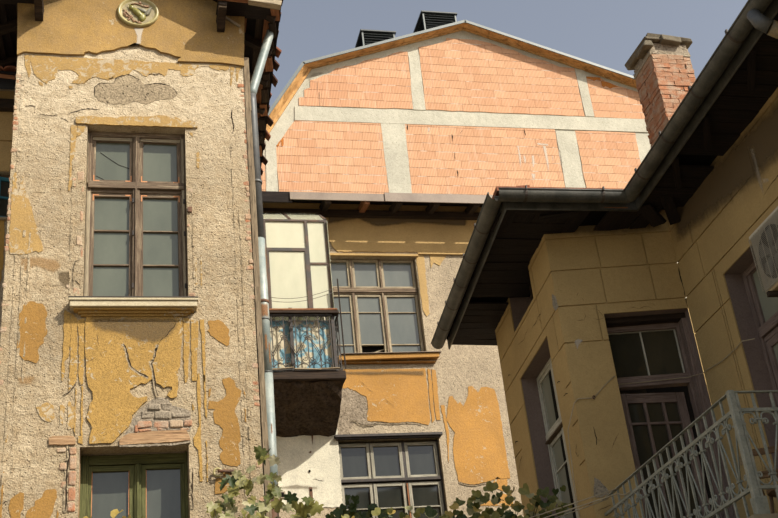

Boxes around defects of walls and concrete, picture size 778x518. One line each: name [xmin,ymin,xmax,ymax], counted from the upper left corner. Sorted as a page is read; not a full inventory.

flaking render [12,55,246,130]
flaking render [68,115,197,191]
flaking render [0,141,43,288]
flaking render [17,301,47,363]
crack [121,320,180,397]
flaking render [36,310,260,494]
flaking render [276,368,513,508]
flaking render [0,485,59,518]